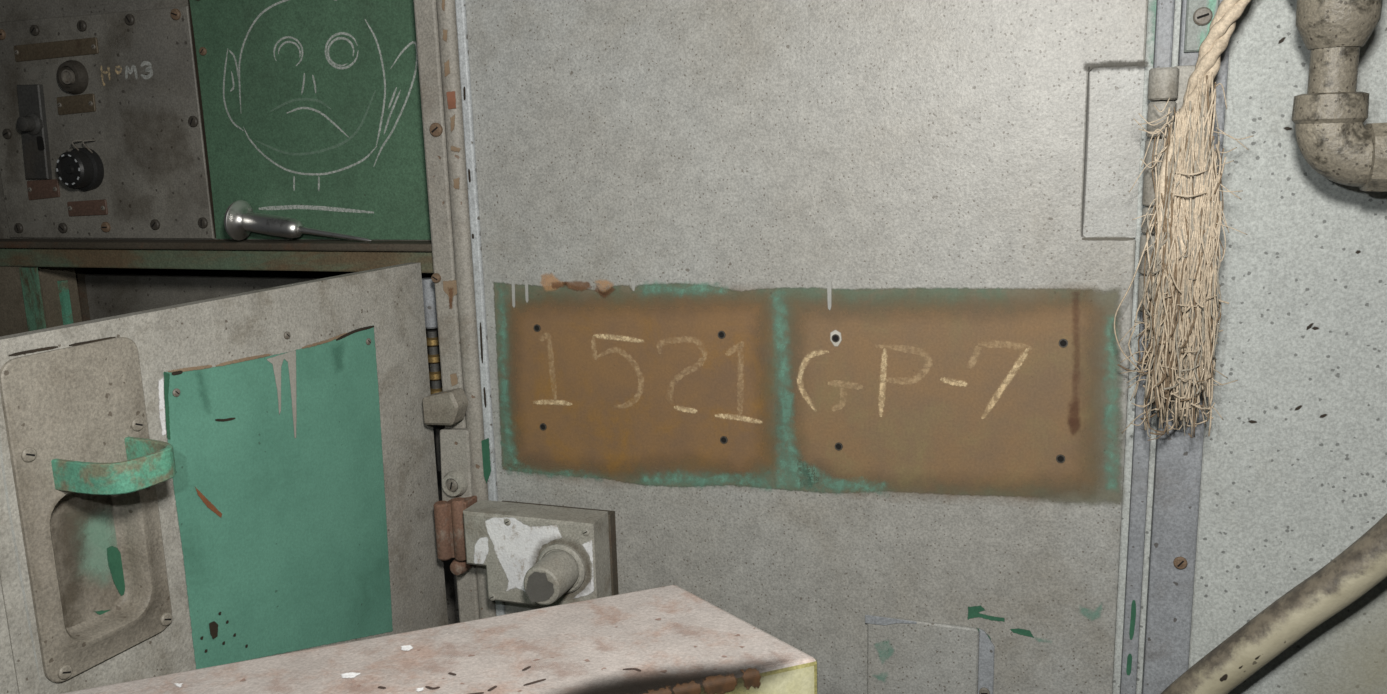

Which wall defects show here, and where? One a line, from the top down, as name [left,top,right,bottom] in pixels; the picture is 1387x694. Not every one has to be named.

corrosion [542,275,614,297]